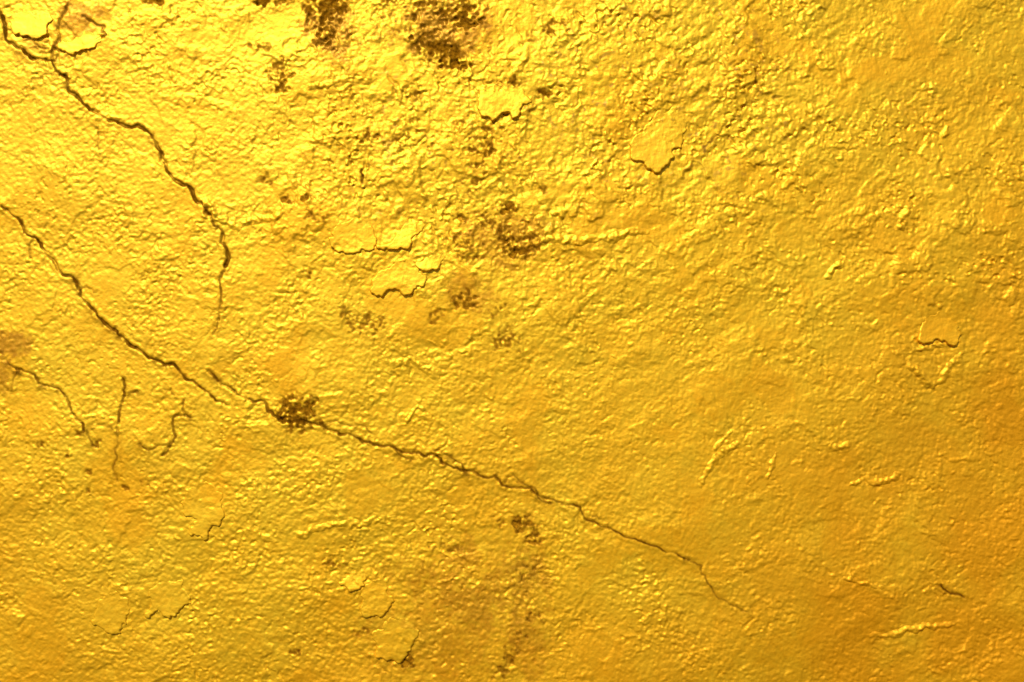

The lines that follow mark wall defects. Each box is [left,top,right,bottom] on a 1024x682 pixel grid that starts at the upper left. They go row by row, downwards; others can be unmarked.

crack [0,5,230,300]
peeling [328,218,446,298]
crack [16,368,92,442]
crack [60,271,686,559]